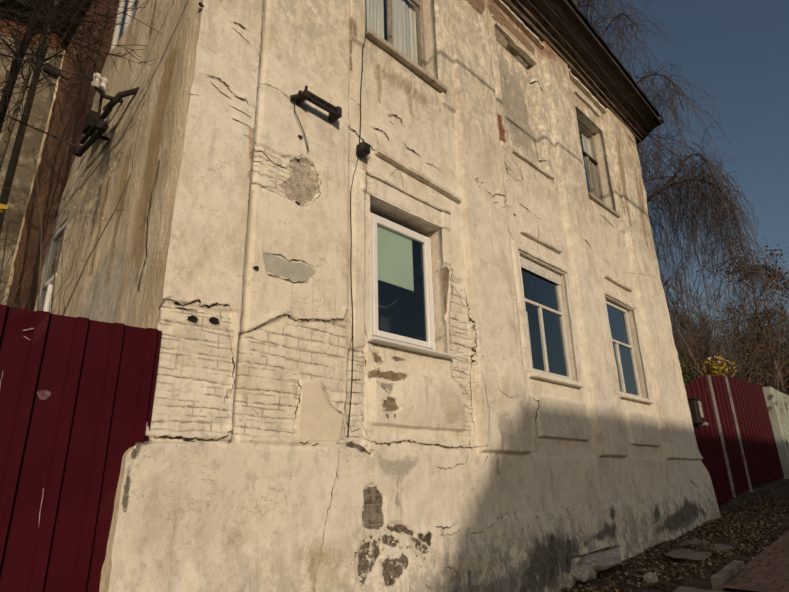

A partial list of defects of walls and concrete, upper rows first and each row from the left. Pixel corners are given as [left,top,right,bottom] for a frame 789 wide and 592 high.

spalling [458,0,535,56]
crack [189,1,321,283]
crack [349,115,442,174]
spalling [497,115,506,143]
spalling [283,156,319,207]
crack [137,160,159,291]
spalling [438,265,451,314]
spalling [368,351,408,419]
crack [154,267,540,592]
spalling [350,485,432,591]
water stain [453,506,616,592]
water stain [654,499,705,533]